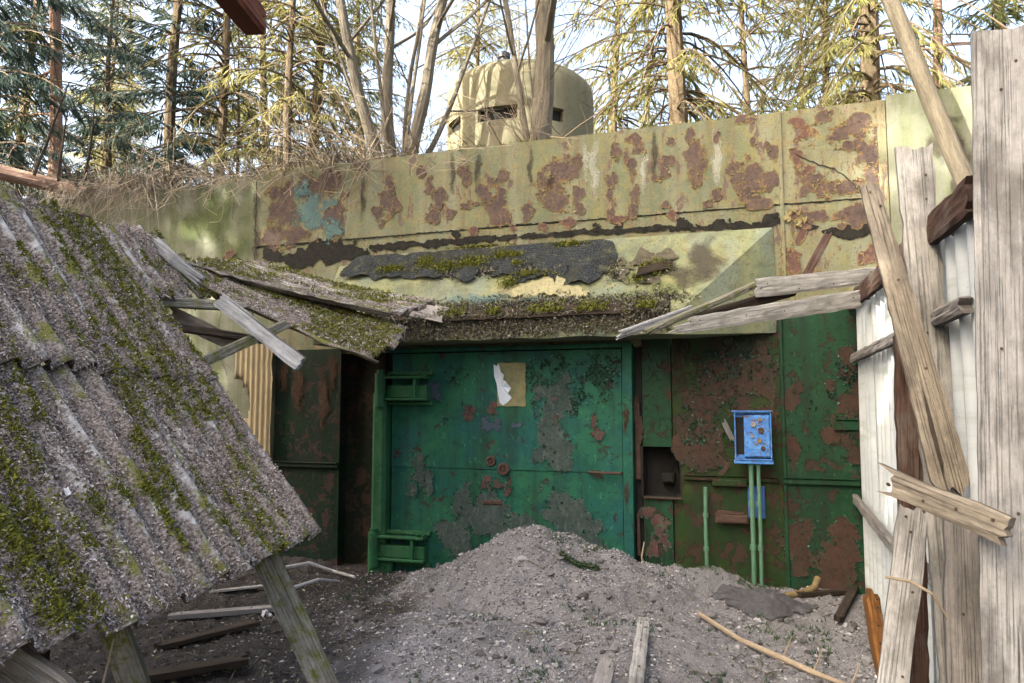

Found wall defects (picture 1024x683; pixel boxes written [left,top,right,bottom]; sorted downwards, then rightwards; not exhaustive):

corrosion [259,168,348,253]
corrosion [369,175,402,228]
corrosion [415,153,587,238]
crack [256,207,747,249]
corrosion [604,107,887,276]
crack [773,154,862,205]
corrosion [722,334,756,358]
corrosion [280,361,303,409]
peeling [525,348,622,472]
peeling [405,446,435,497]
peeling [433,475,608,557]